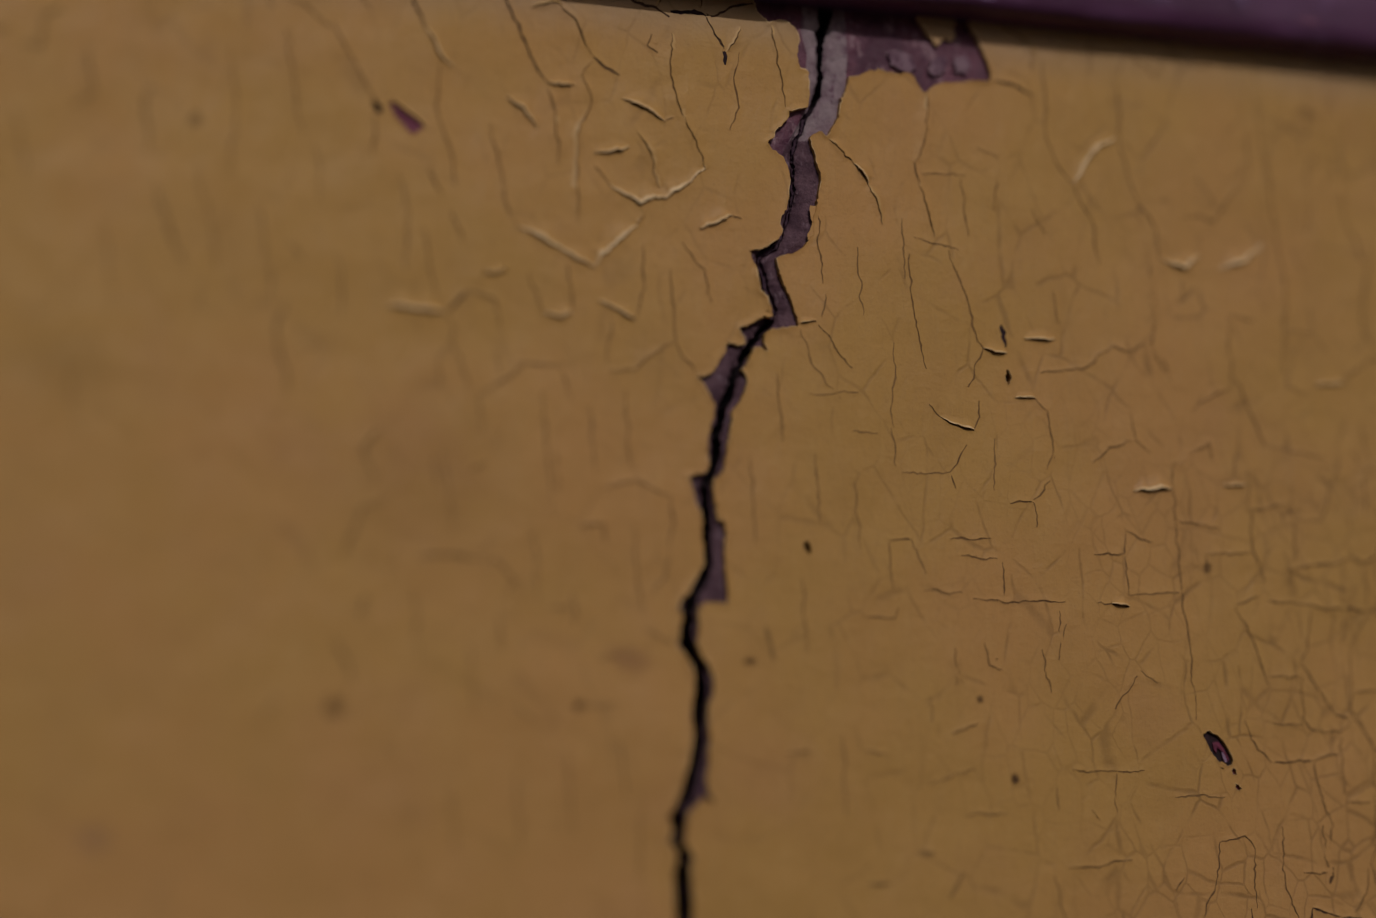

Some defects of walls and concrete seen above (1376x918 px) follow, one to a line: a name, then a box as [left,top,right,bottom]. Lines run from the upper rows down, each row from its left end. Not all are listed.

peeling [750,0,808,75]
peeling [844,10,996,93]
peeling [369,97,429,138]
crack [497,0,1251,918]
peeling [902,400,986,481]
peeling [1201,728,1244,794]
crack [1304,902,1376,918]